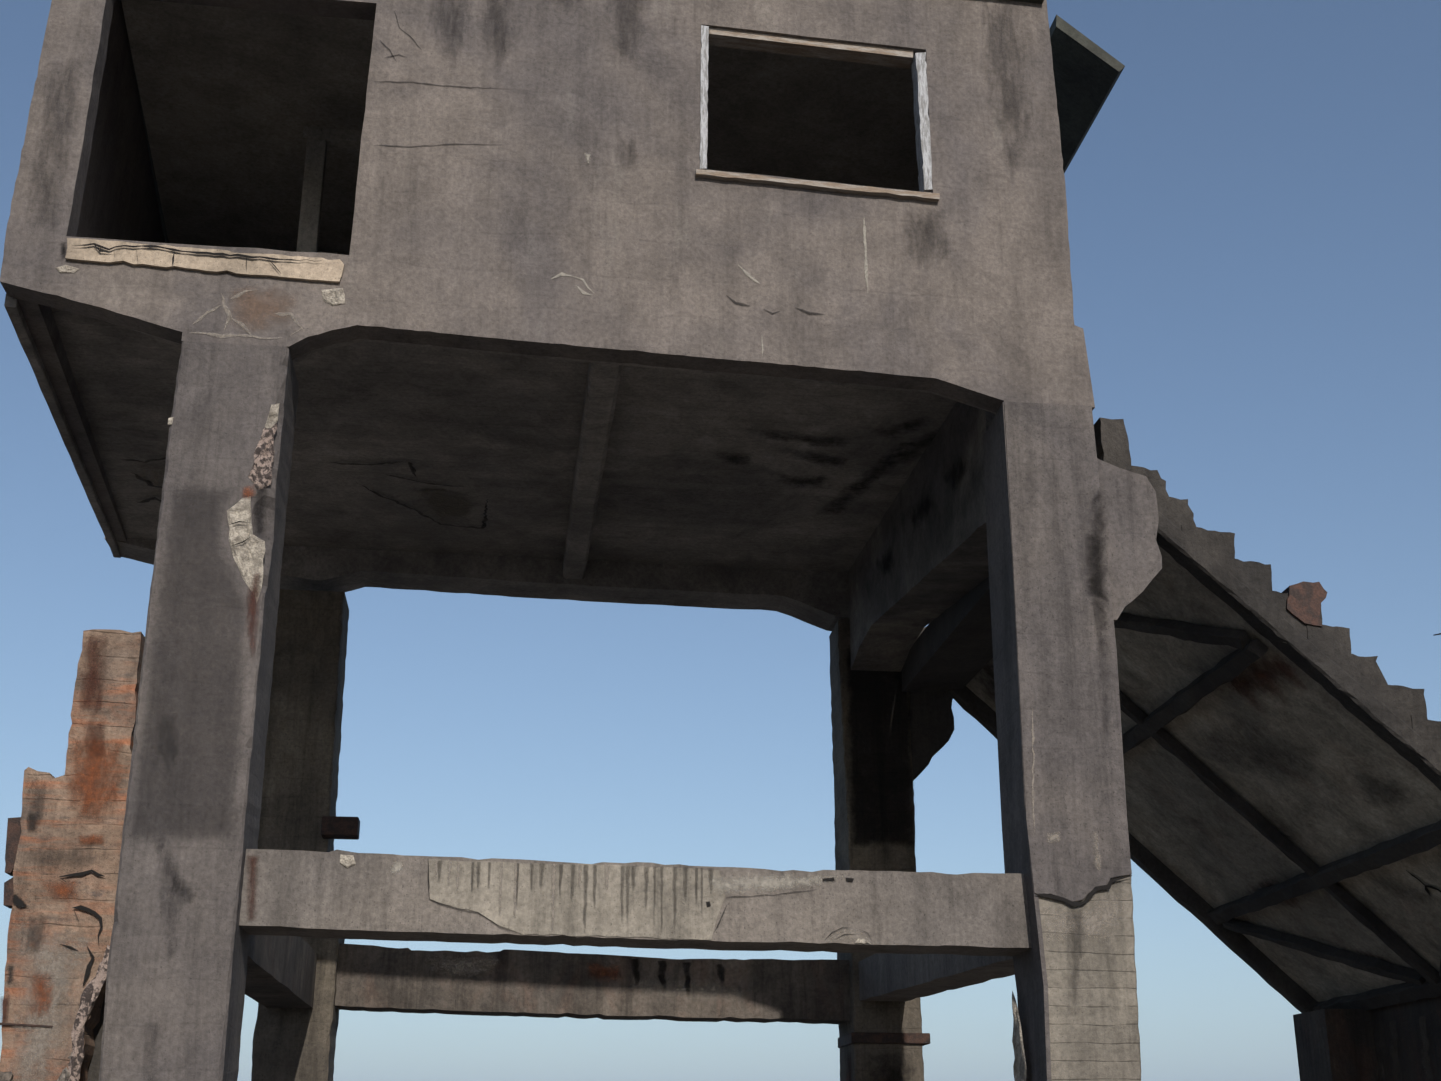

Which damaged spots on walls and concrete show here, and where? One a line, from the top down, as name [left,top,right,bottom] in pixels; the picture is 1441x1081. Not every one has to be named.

crack [376,11,499,89]
crack [382,141,489,149]
spalling [56,243,79,273]
crack [75,243,315,339]
spalling [227,403,280,643]
rust [85,640,102,707]
spalling [12,894,27,908]
water stain [499,862,519,915]
flaking render [427,859,854,940]
spalling [68,945,110,1081]
spalling [1012,990,1027,1081]